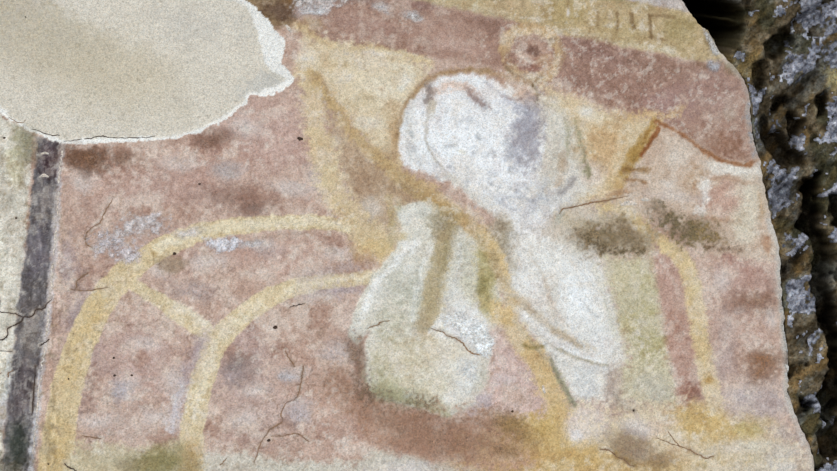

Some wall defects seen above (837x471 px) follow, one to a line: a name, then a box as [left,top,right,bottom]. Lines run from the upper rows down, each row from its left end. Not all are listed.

flaking render [0,0,294,217]
peeling [93,212,171,263]
peeling [178,228,259,252]
crack [0,299,52,377]
crack [431,328,480,355]
peeling [32,346,46,452]
crack [255,351,309,460]
crack [657,431,713,459]